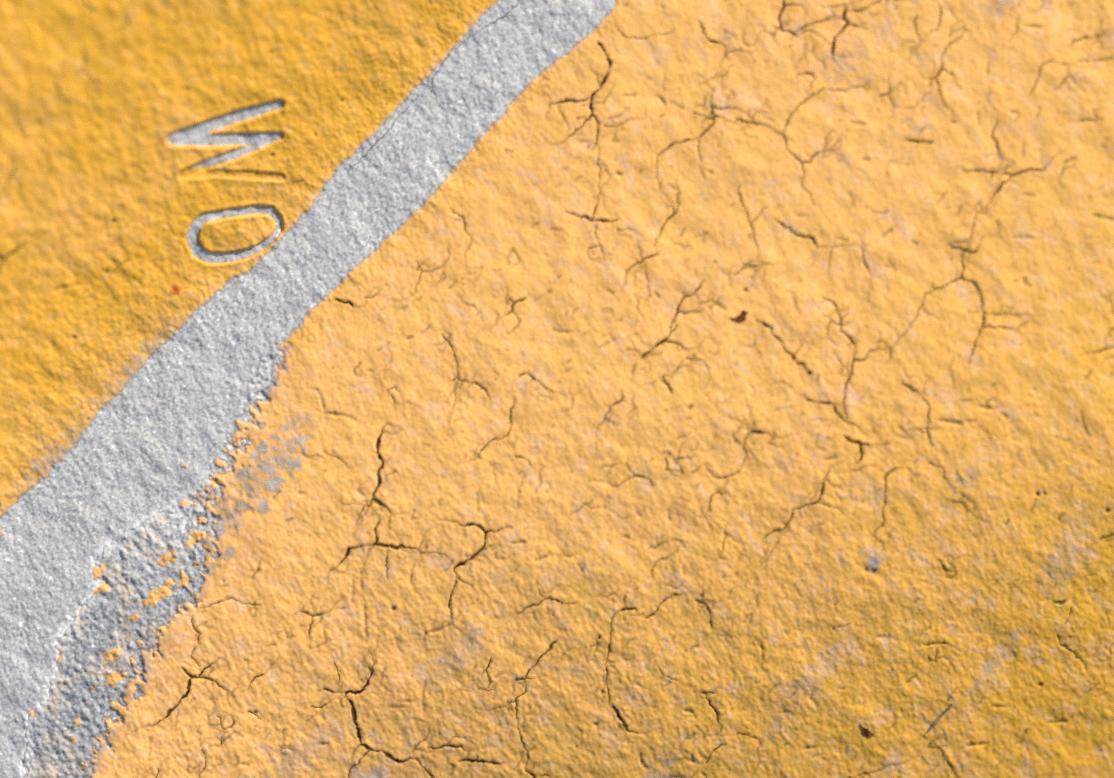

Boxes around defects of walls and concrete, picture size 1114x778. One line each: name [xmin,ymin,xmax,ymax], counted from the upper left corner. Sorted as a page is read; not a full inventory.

crack [556,0,965,285]
peeling [0,0,616,778]
crack [442,334,548,469]
crack [642,282,702,393]
crack [757,121,1043,511]
crack [337,387,508,616]
crack [619,421,775,559]
crack [764,470,844,548]
crack [155,597,264,777]
crack [311,641,557,778]
crack [598,589,712,732]
crack [701,692,758,778]